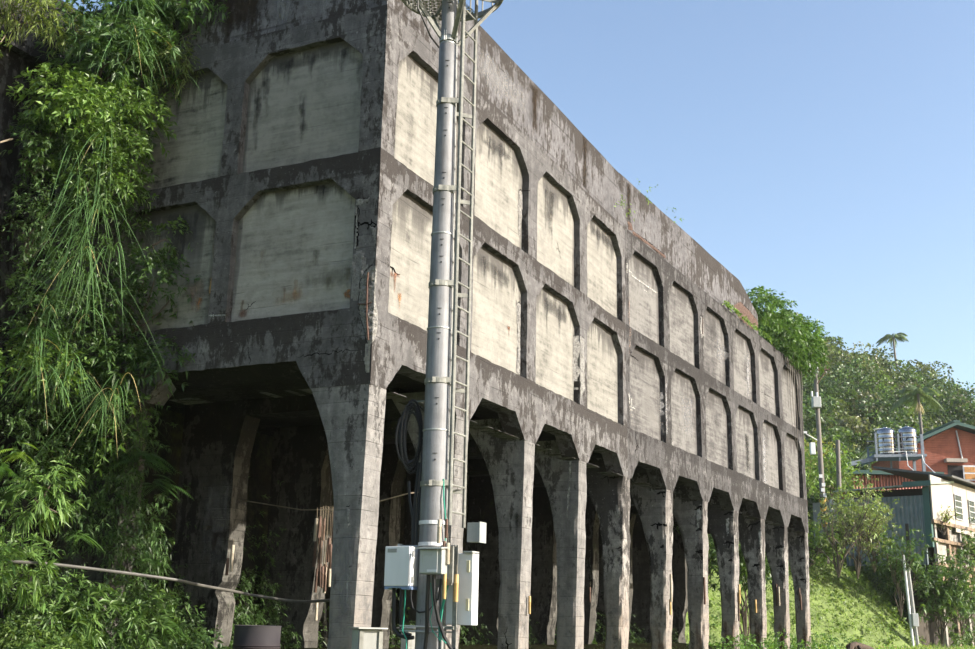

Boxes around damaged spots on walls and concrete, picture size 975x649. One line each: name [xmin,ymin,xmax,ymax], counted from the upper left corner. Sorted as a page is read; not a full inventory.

spalling [351,197,378,373]
crack [355,207,377,250]